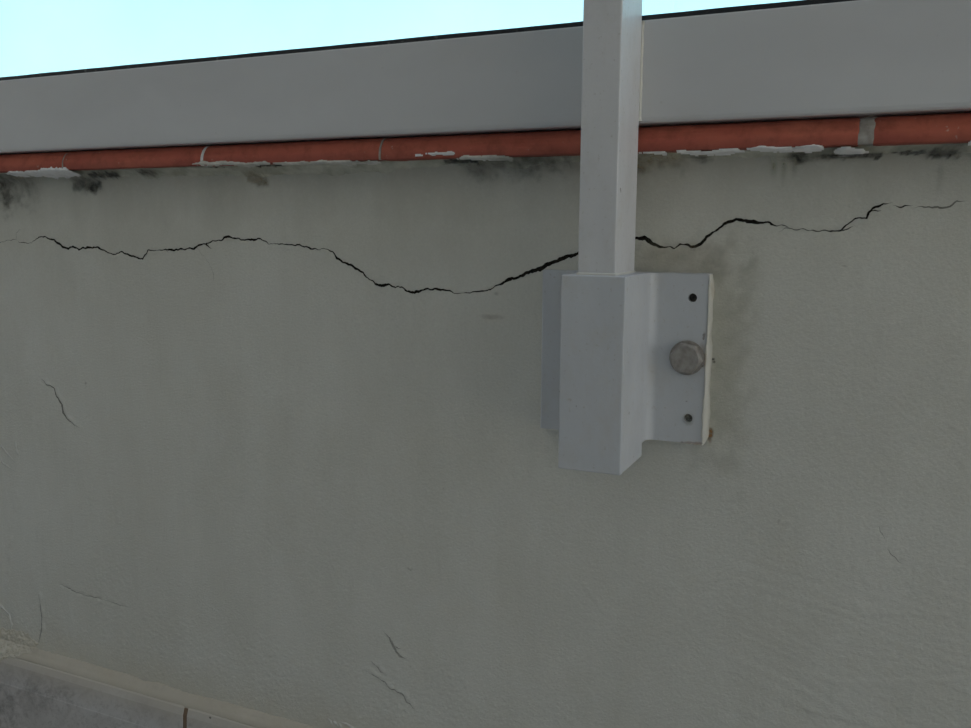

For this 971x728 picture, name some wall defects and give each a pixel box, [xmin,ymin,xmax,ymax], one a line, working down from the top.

water stain [789,152,808,163]
water stain [821,148,959,160]
crack [635,200,963,249]
crack [0,230,578,294]
crack [43,380,76,426]